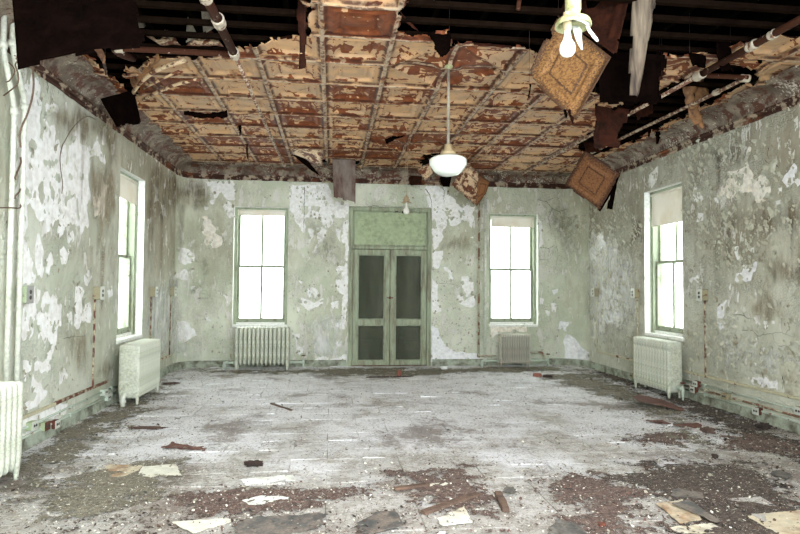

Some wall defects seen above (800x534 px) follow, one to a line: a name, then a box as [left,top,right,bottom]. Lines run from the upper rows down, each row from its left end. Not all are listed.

peeling [200,179,238,248]
peeling [649,166,658,188]
peeling [689,187,704,222]
peeling [714,147,800,205]
peeling [15,75,115,437]
peeling [289,183,349,330]
peeling [425,186,477,314]
peeling [588,230,618,273]
peeling [311,340,347,362]
peeling [431,326,479,362]